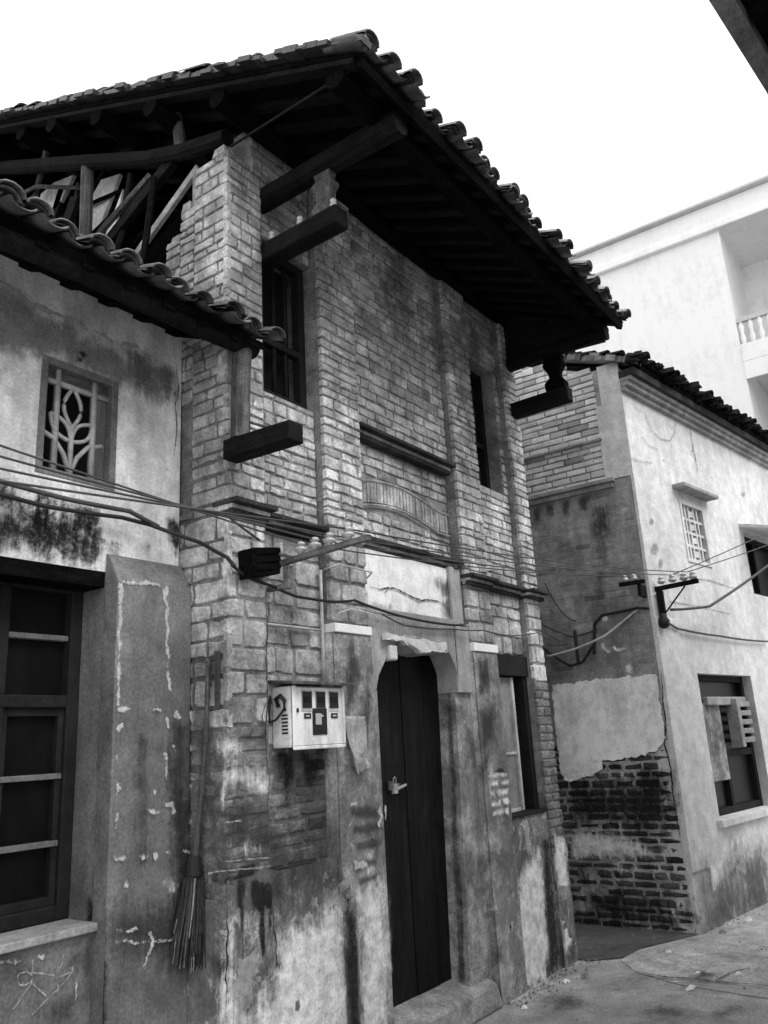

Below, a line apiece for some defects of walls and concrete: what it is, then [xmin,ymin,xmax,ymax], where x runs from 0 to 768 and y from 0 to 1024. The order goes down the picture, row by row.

water stain [0,289,179,397]
water stain [0,485,118,566]
water stain [535,497,608,548]
crack [371,587,447,607]
peeling [116,580,172,732]
water stain [480,660,489,694]
peeling [154,708,193,729]
water stain [480,711,496,769]
peeling [148,801,176,815]
water stain [448,694,465,981]
peeling [116,926,176,945]
water stain [220,852,390,1024]